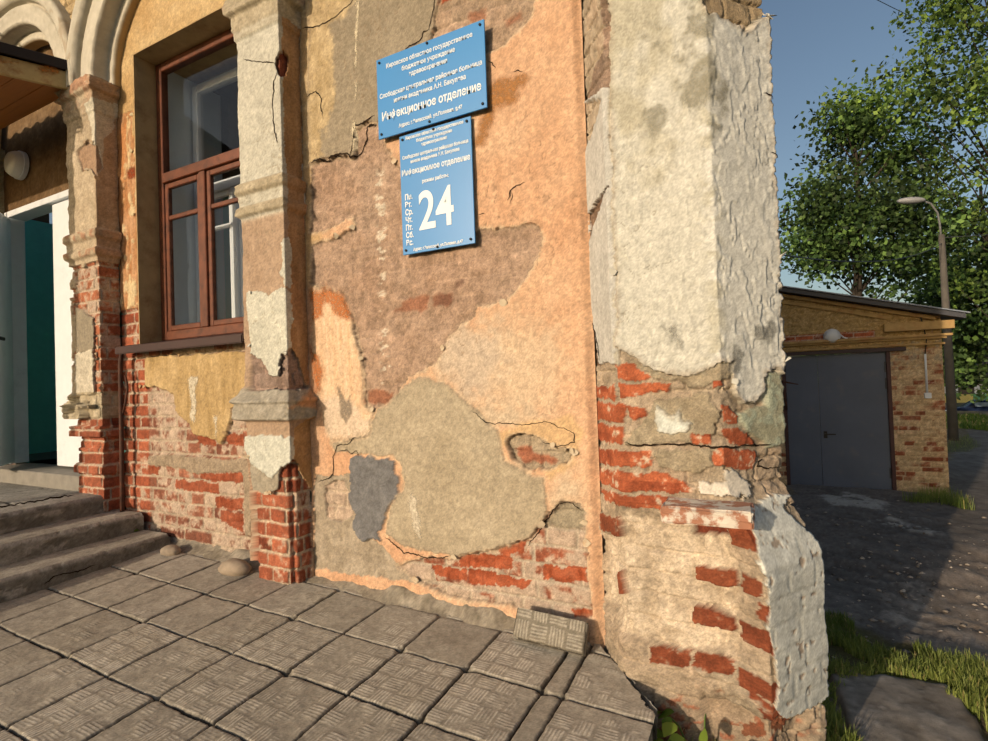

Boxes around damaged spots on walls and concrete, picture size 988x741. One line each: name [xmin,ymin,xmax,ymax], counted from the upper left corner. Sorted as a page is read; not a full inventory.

flaking render [432,0,535,54]
flaking render [702,0,777,26]
flaking render [310,121,543,412]
flaking render [69,110,313,585]
crack [0,495,72,508]
flaking render [326,479,354,521]
flaking render [398,346,827,741]
crack [45,565,93,584]